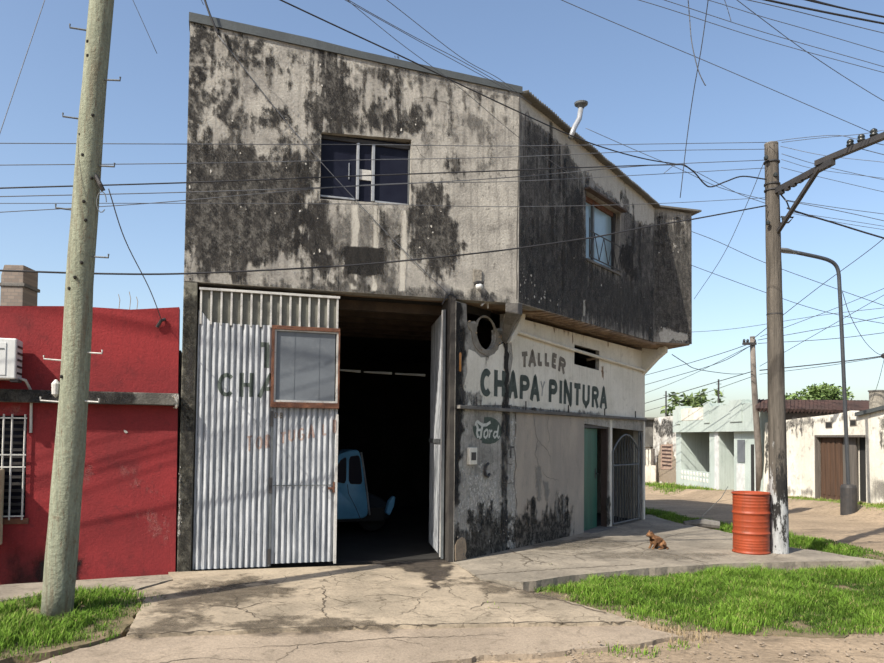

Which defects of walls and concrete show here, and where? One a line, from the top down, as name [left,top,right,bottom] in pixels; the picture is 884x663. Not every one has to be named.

damp [184,23,509,294]
damp [544,123,568,286]
damp [619,203,644,295]
flaking render [458,419,517,549]
damp [454,331,573,562]
damp [786,415,850,436]
damp [871,482,884,499]
crack [154,574,632,663]